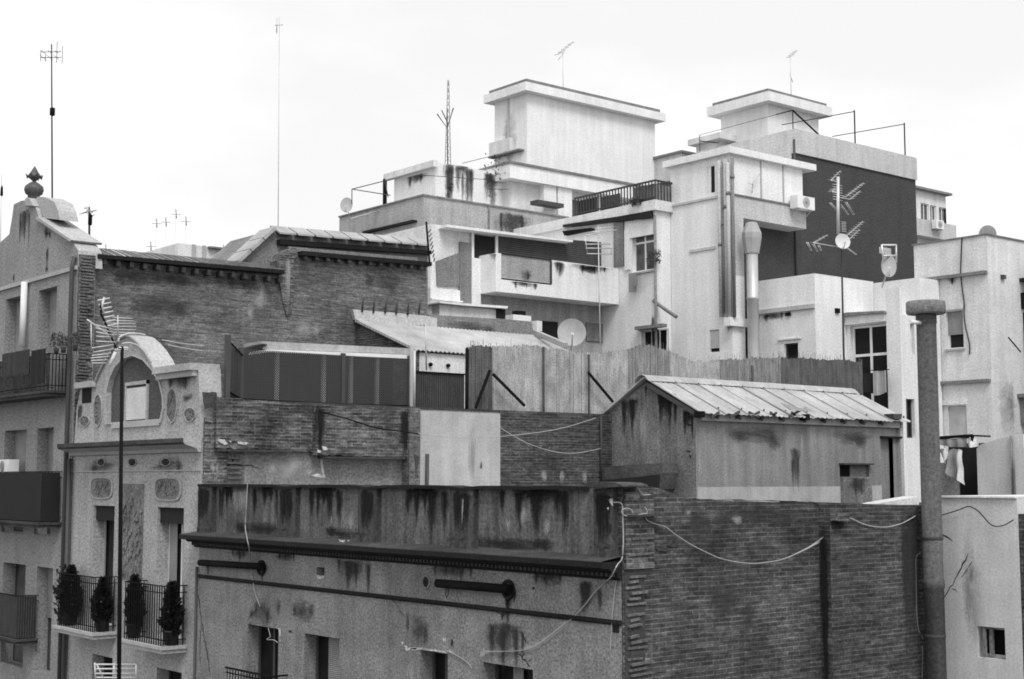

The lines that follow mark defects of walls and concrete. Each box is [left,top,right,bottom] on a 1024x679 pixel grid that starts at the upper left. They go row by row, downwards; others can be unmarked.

water stain [445,165,525,233]
water stain [621,386,693,440]
water stain [309,488,373,539]
water stain [406,488,469,528]
water stain [478,490,569,549]
water stain [595,495,610,531]
crack [943,535,972,598]
water stain [490,624,524,661]